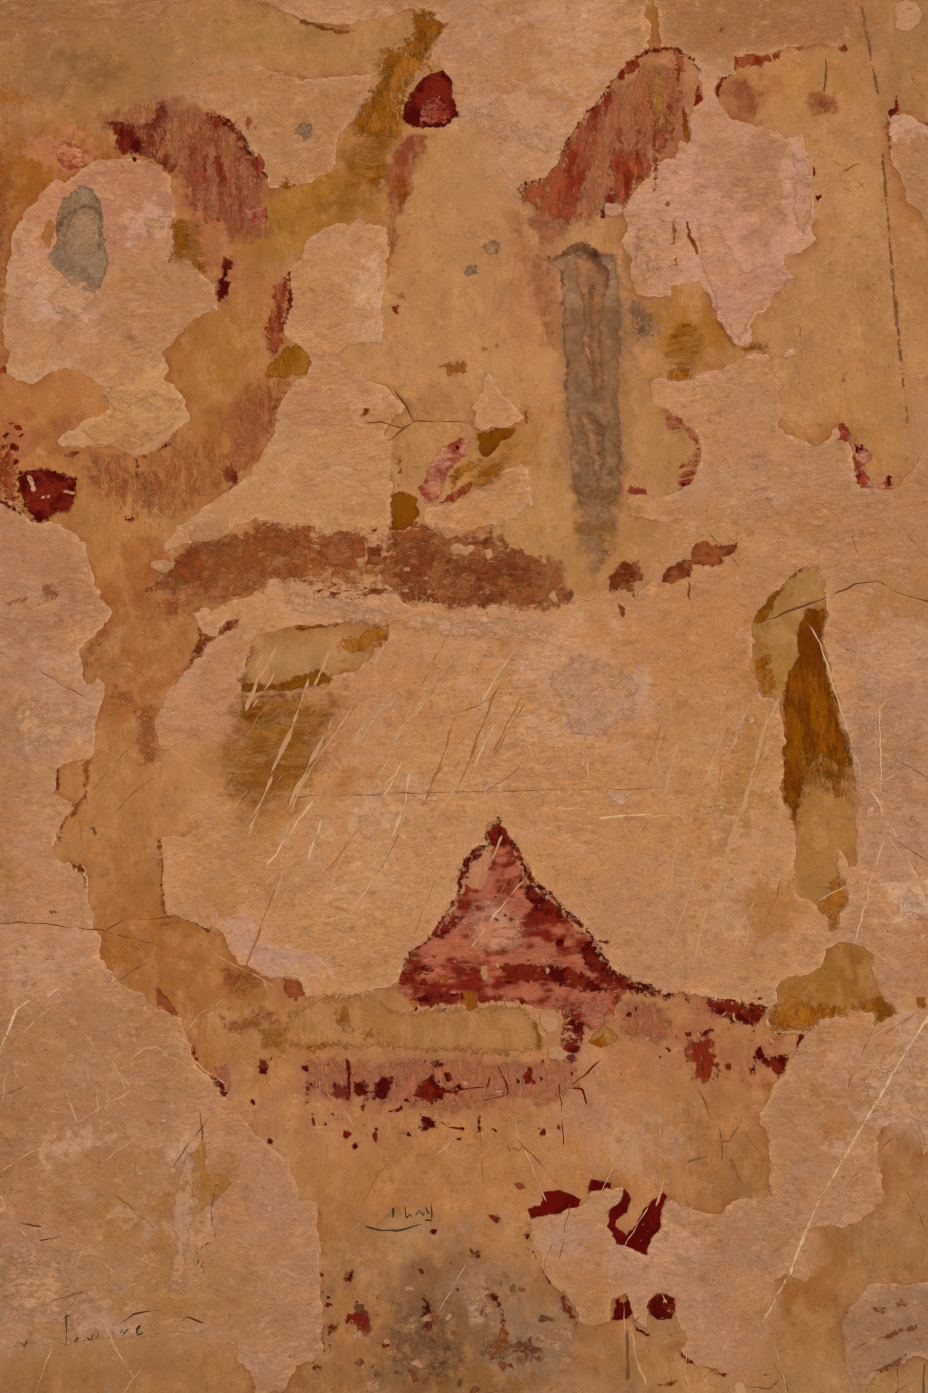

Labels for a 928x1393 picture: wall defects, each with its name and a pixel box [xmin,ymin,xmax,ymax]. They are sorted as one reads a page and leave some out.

flaking render [42,186,108,317]
crack [367,391,465,441]
peeling [240,621,389,692]
peeling [749,565,874,932]
peeling [420,818,564,946]
crack [0,917,169,944]
flaking render [454,955,489,982]
peeling [495,957,614,993]
peeling [916,984,926,1008]
peeling [864,1035,928,1148]
peeling [169,1114,231,1305]
peeling [0,1244,82,1325]